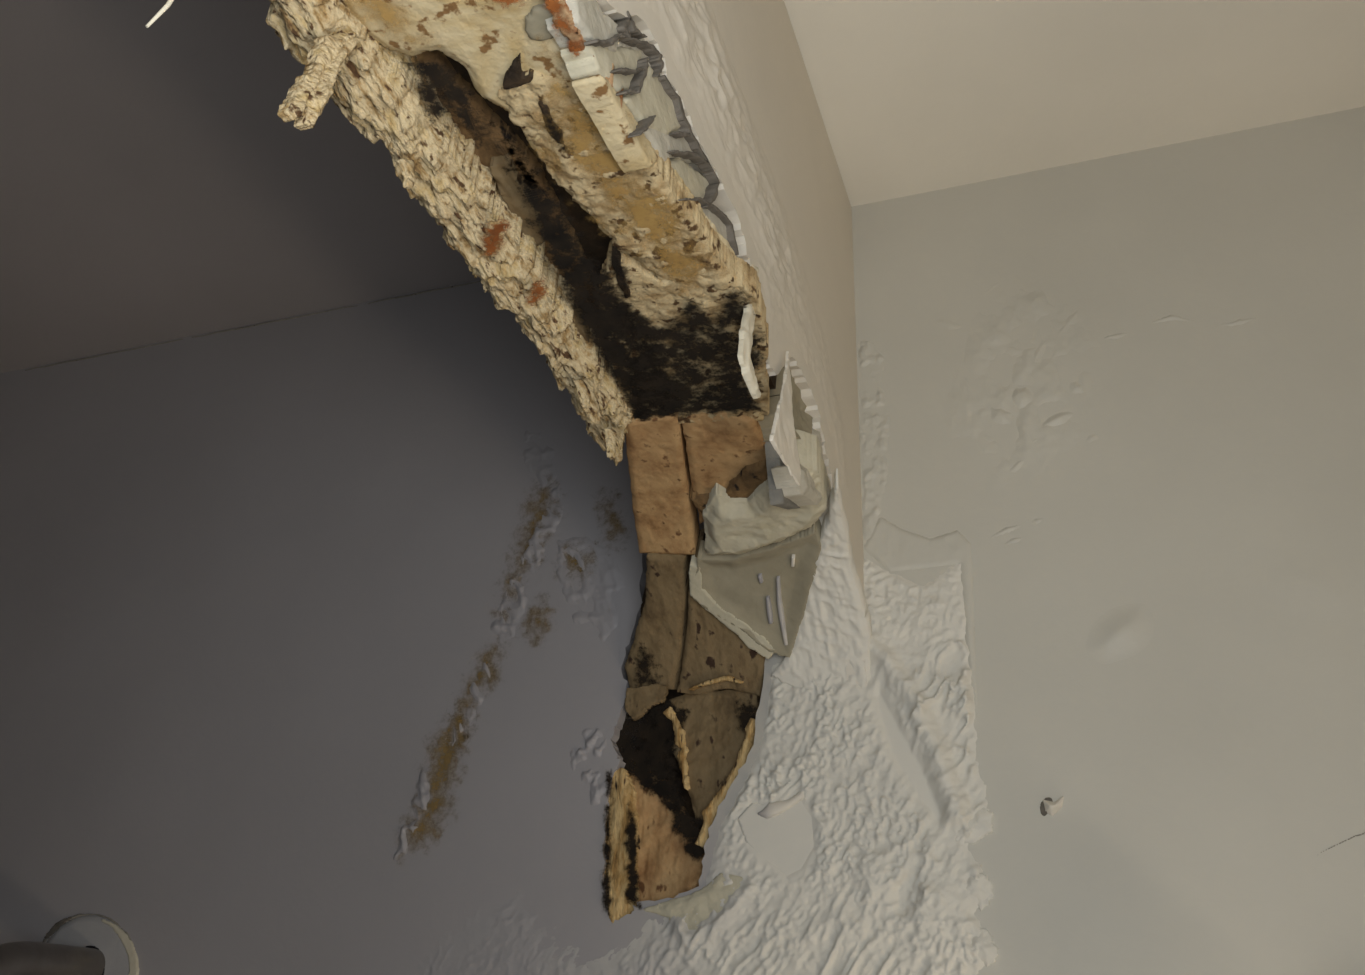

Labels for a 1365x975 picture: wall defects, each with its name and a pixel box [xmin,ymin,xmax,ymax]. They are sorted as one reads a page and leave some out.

flaking render [145,0,174,28]
rust [544,0,582,57]
rust [481,219,512,256]
water stain [400,62,766,422]
rust [525,278,548,306]
flaking render [266,0,831,659]
water stain [406,648,498,843]
peeling [570,728,609,806]